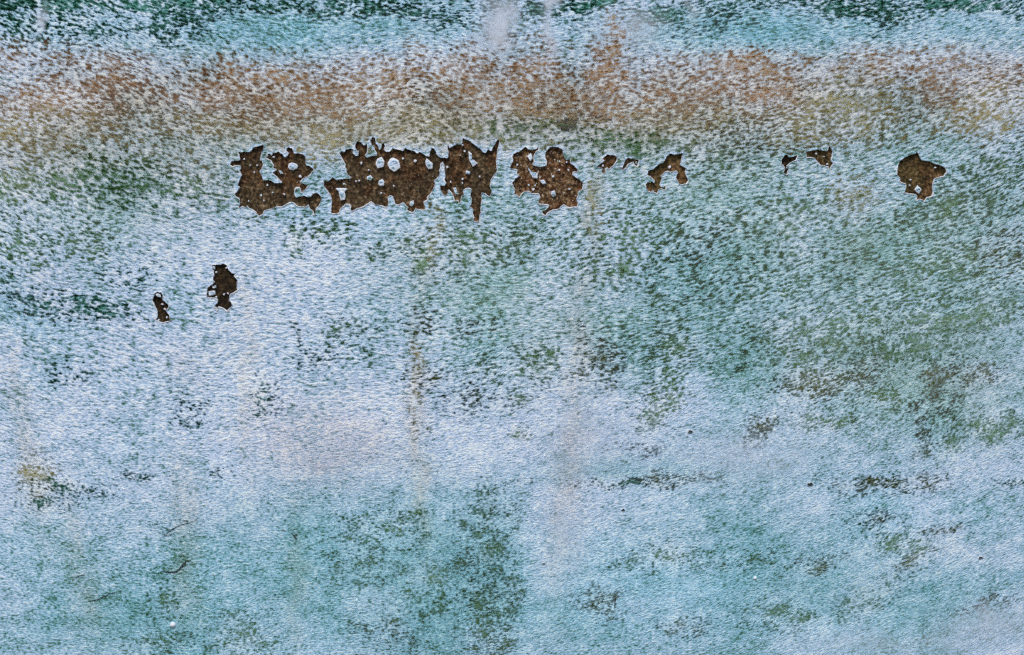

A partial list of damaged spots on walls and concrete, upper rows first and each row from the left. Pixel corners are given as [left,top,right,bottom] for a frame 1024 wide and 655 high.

corrosion [0,9,1024,159]
peeling [229,136,584,222]
peeling [596,153,689,195]
peeling [780,146,834,175]
peeling [896,152,947,202]
peeling [151,292,172,324]
peeling [206,264,239,313]